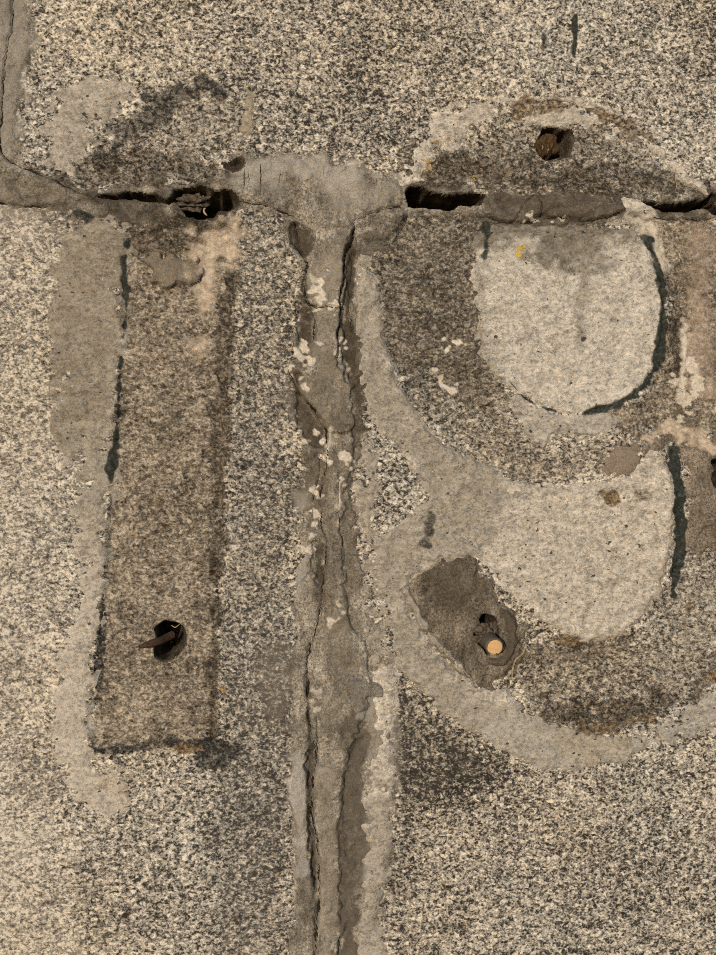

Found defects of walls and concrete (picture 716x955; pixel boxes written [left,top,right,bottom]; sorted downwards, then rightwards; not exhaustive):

crack [0,0,91,196]
crack [239,201,408,358]
crack [488,195,624,224]
crack [288,370,344,954]